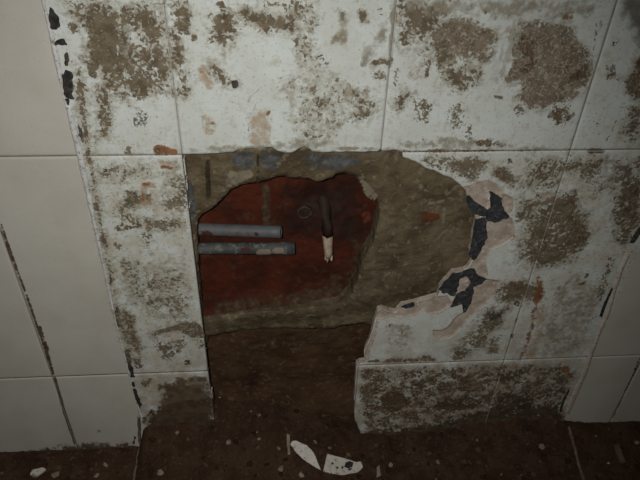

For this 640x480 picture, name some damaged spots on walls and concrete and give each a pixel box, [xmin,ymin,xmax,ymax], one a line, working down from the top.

damp [67,0,197,249]
rust [153,145,177,155]
mould [207,0,327,78]
damp [280,72,375,148]
damp [378,0,498,95]
damp [403,103,640,268]
mould [502,19,597,125]
crack [1,224,76,445]
mould [120,259,207,361]
spalling [183,147,515,422]
damp [359,277,574,433]
rust [520,277,545,359]